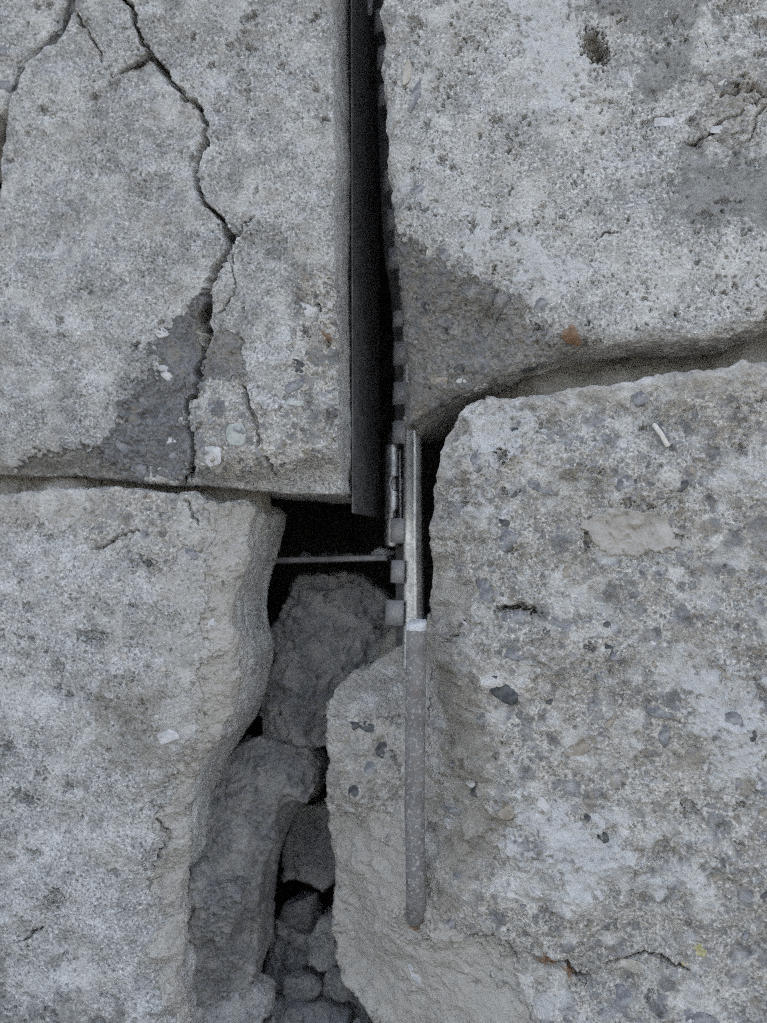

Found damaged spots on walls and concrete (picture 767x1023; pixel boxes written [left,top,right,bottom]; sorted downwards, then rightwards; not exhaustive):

crack [123,0,203,112]
crack [208,206,252,341]
spalling [0,263,341,1023]
crack [626,950,688,970]